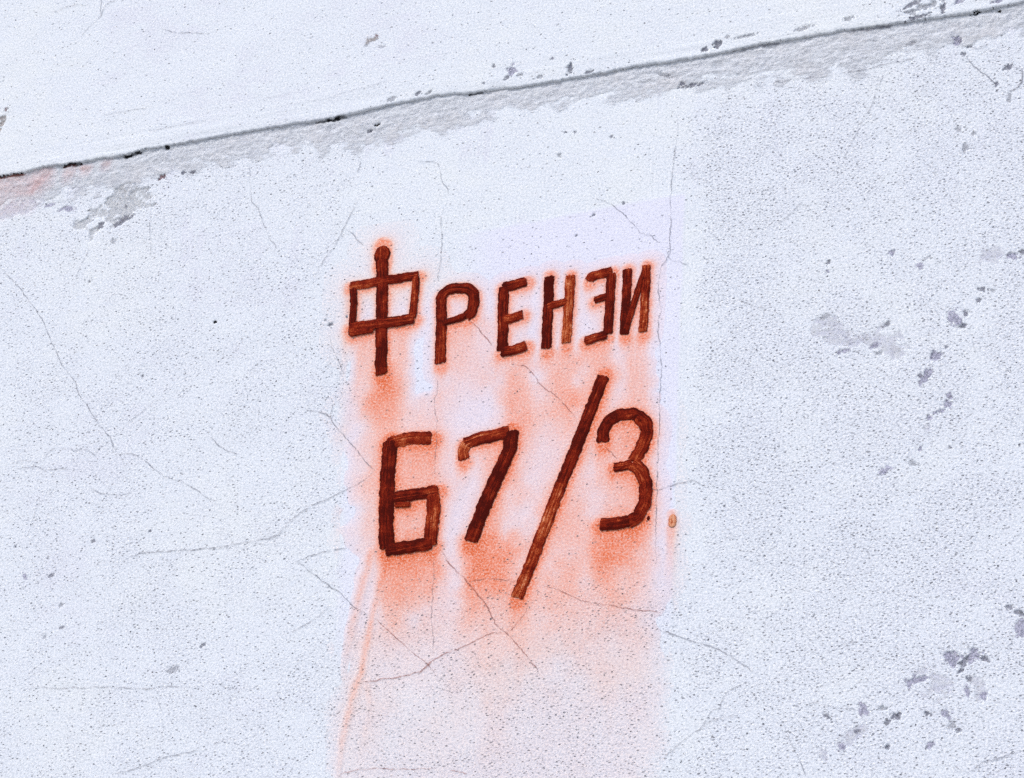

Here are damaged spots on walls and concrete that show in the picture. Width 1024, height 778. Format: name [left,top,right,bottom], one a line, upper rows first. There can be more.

spalling [0,0,1024,229]